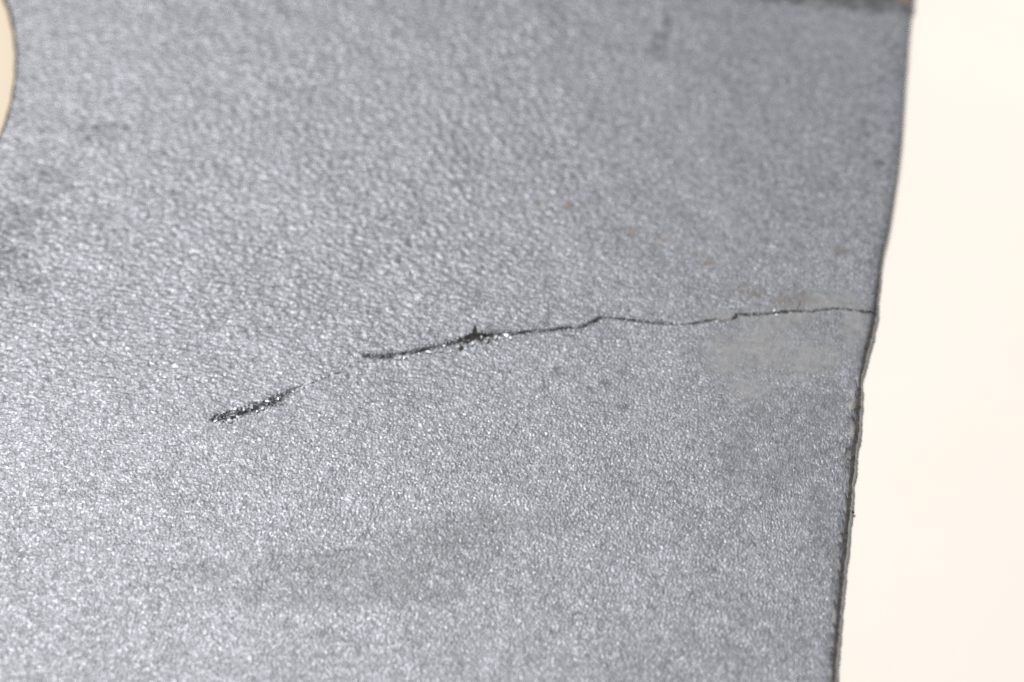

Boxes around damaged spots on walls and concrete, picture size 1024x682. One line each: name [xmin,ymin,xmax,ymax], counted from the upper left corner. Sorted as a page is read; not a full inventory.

crack [211,300,874,423]